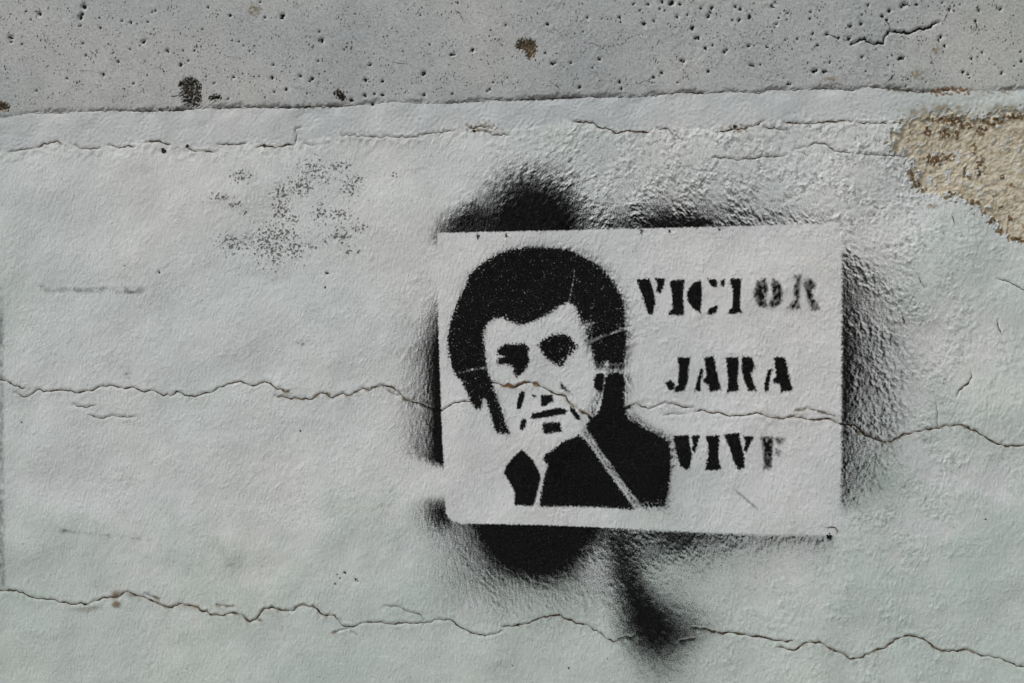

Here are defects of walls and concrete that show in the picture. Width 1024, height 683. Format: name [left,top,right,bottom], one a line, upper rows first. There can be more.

crack [11,75,1013,154]
crack [713,120,908,161]
peeling [884,105,1024,244]
crack [0,379,472,419]
crack [492,381,593,418]
crack [623,374,1024,447]
crack [0,589,632,642]
crack [683,627,1024,667]